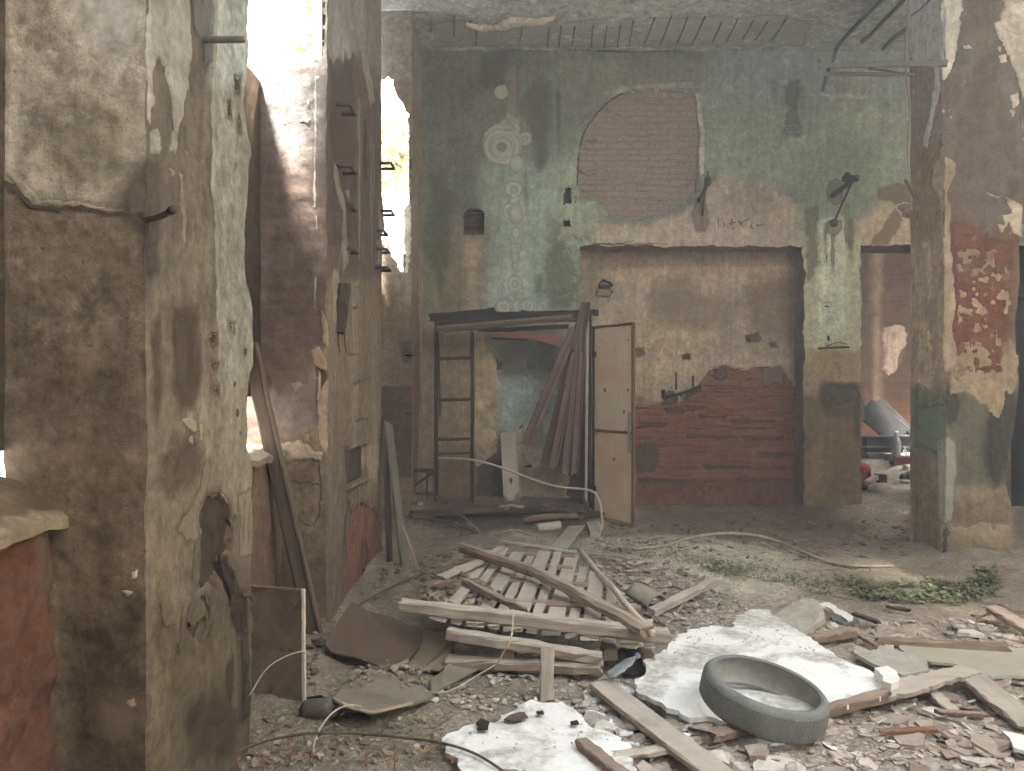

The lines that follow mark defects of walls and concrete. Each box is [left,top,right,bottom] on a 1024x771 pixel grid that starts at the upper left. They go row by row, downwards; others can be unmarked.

flaking render [145,0,192,156]
peeling [465,16,555,32]
flaking render [558,81,706,311]
flaking render [907,0,1024,418]
flaking render [281,310,329,464]
flaking render [620,328,805,484]
flaking render [882,325,907,375]
flaking render [181,475,253,657]